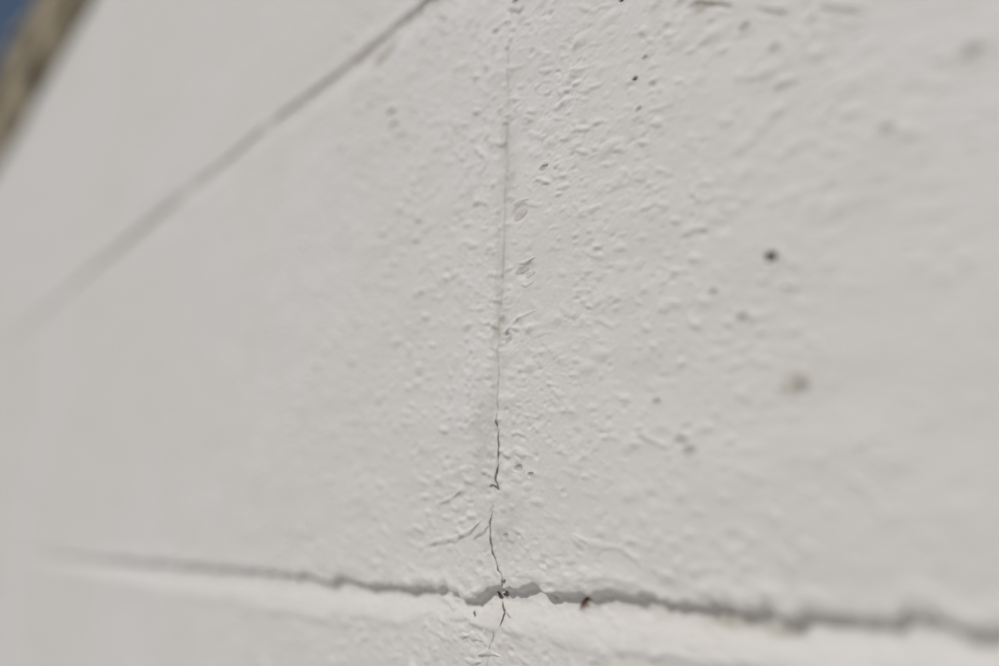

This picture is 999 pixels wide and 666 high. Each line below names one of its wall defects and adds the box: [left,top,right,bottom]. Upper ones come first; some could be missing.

crack [473,0,524,627]